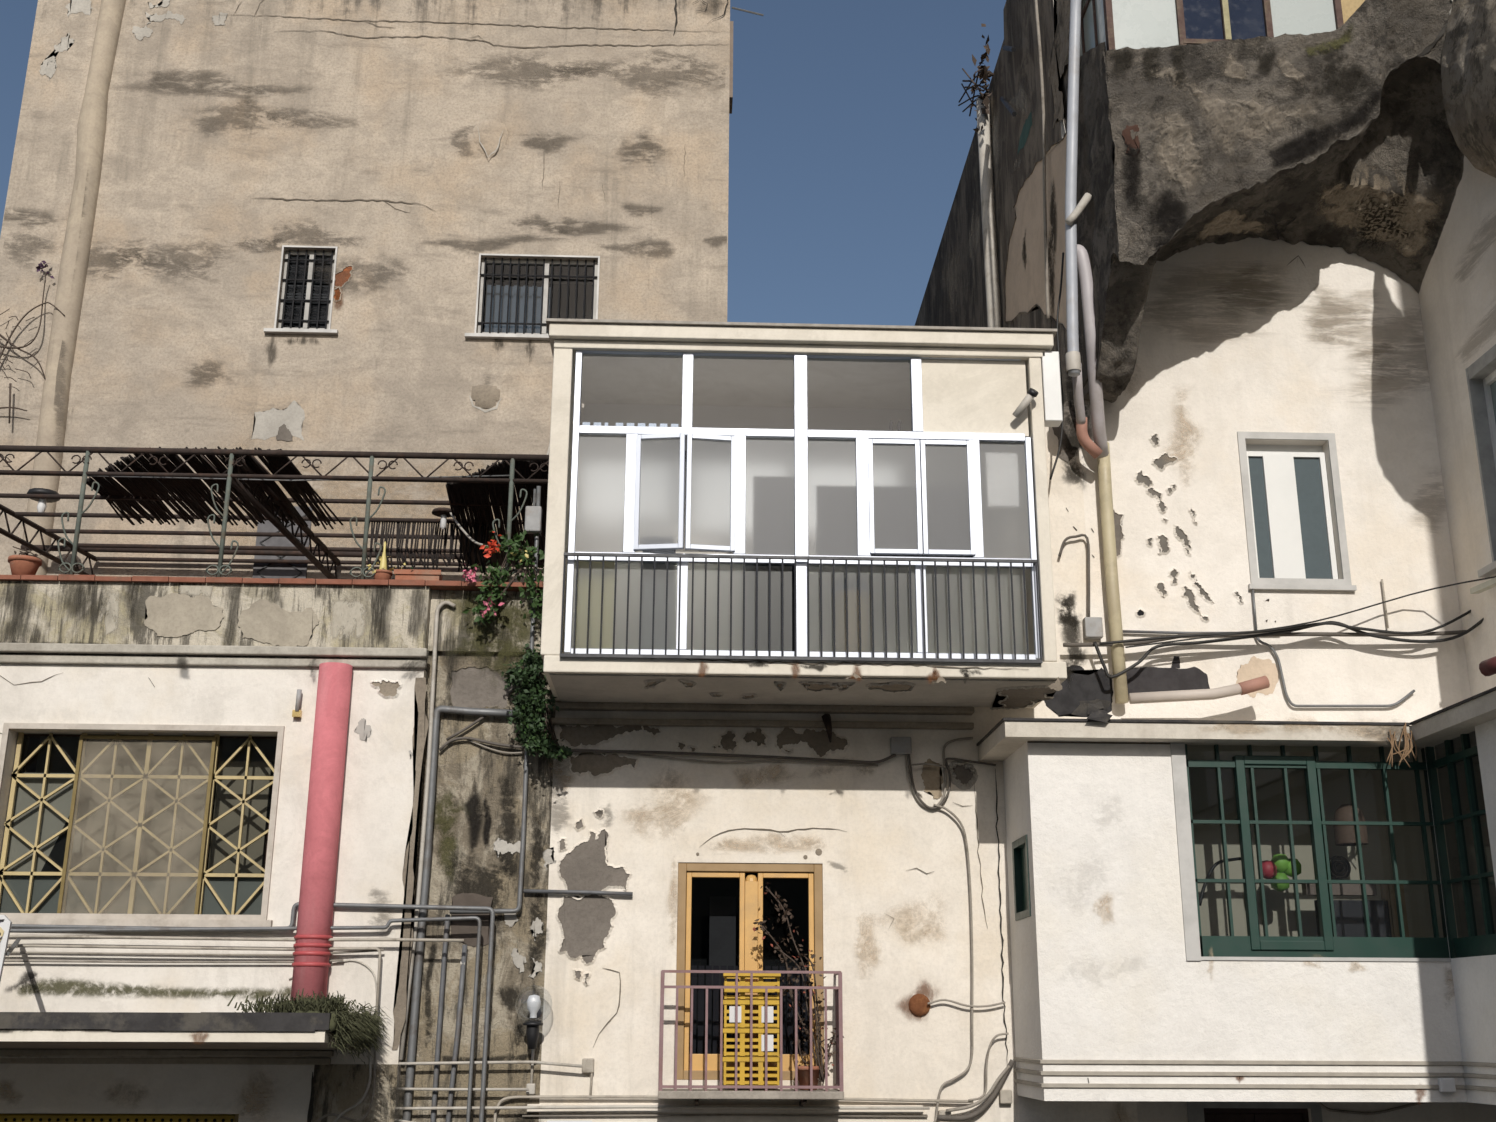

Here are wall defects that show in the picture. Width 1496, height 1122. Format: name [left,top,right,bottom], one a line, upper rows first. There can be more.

peeling [39,0,92,79]
peeling [1113,508,1125,559]
peeling [1134,432,1215,623]
damp [66,584,99,619]
damp [226,587,240,646]
peeling [144,585,365,646]
damp [372,588,390,640]
peeling [557,725,850,779]
damp [434,779,547,971]
peeling [450,808,633,987]
damp [425,945,436,1035]
damp [443,988,531,1062]